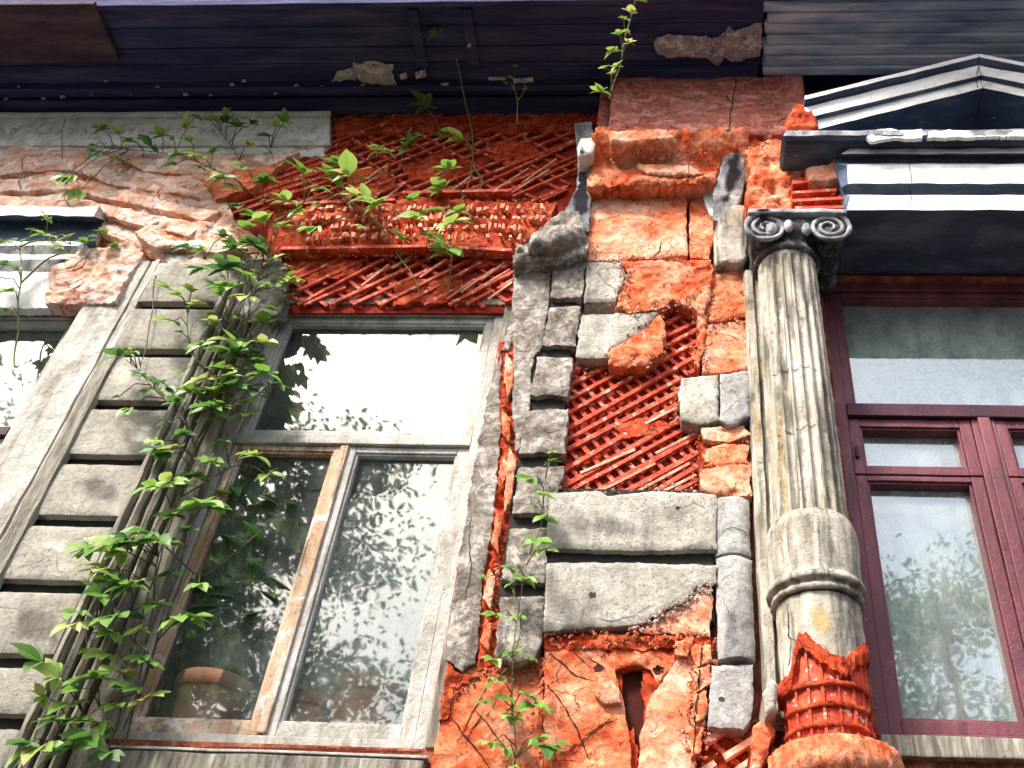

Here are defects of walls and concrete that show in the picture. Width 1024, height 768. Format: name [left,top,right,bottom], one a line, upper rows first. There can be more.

peeling [331,61,427,86]
peeling [654,22,762,65]
crack [729,80,737,129]
flaking render [0,104,844,506]
crack [546,604,654,759]
flaking render [431,578,905,768]